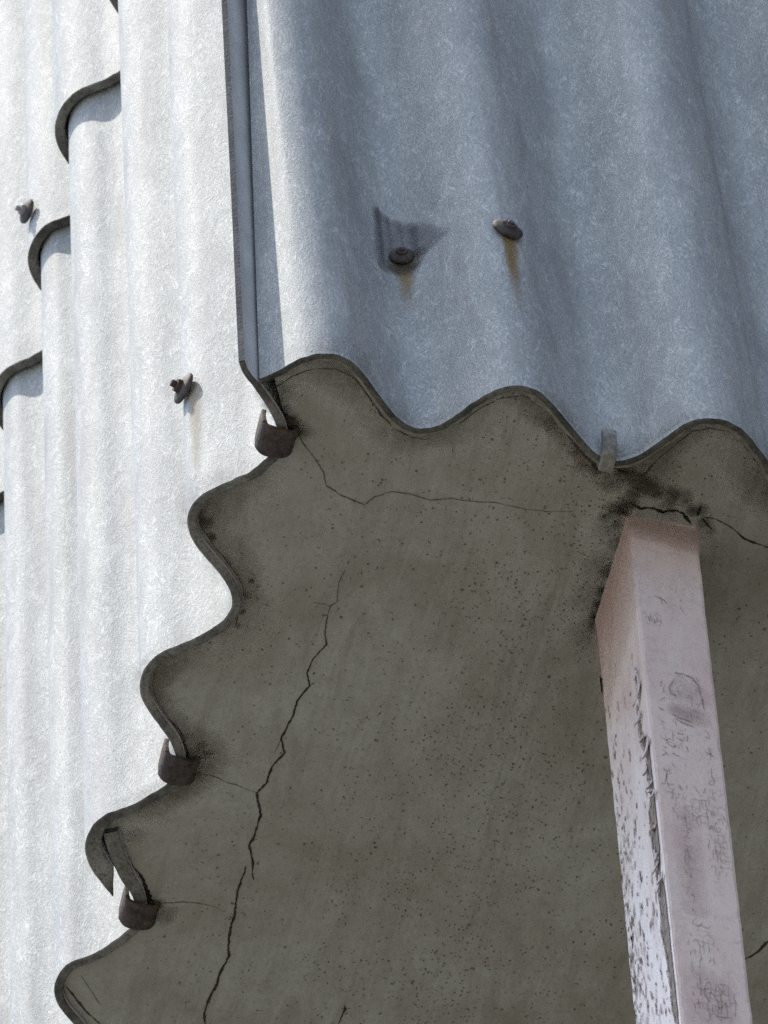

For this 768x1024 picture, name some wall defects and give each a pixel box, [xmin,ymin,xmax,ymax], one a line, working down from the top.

corrosion [506,237,516,273]
crack [299,433,573,512]
water stain [603,469,680,526]
crack [632,505,768,548]
crack [171,569,346,1023]